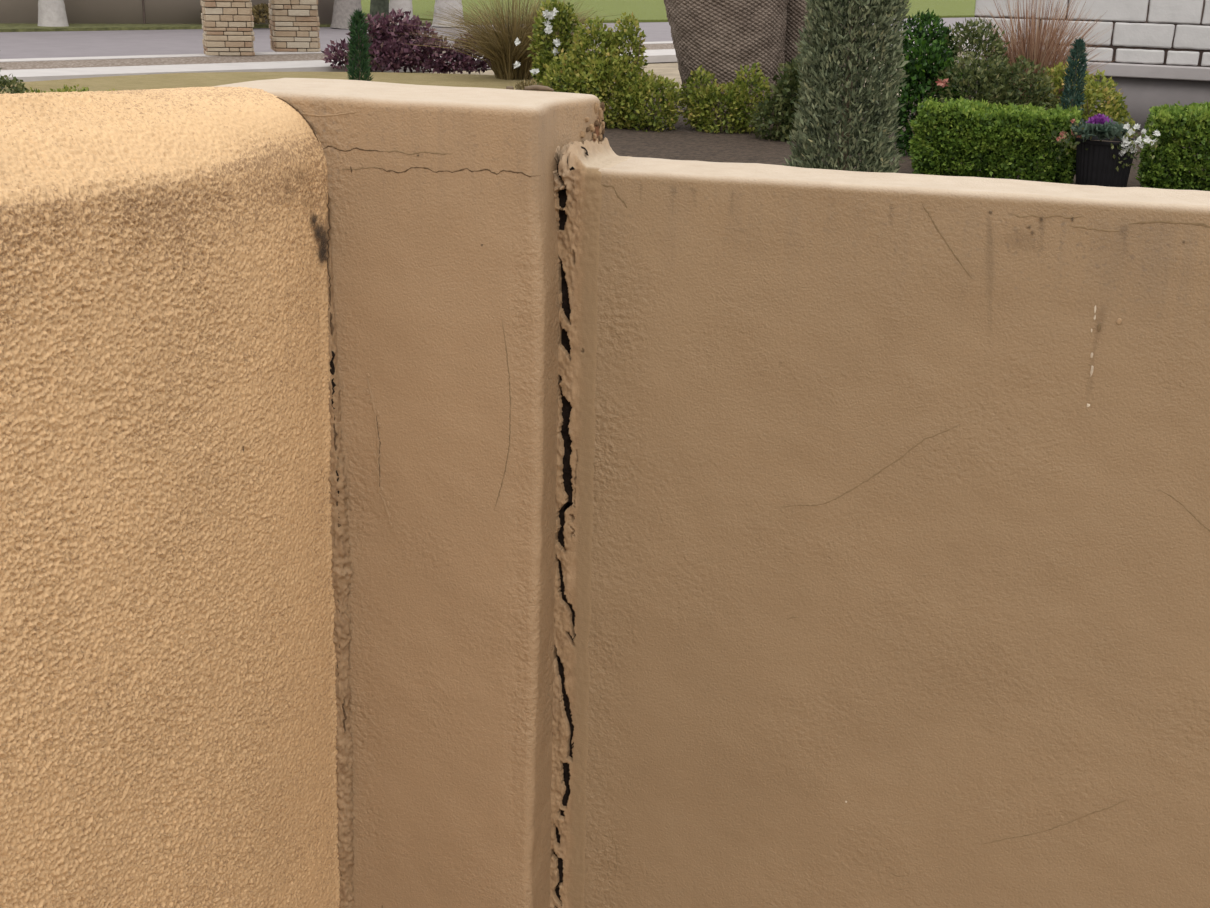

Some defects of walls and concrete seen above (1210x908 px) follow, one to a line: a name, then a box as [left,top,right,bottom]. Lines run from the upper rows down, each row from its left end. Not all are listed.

crack [276,97,589,527]
crack [337,600,347,731]
crack [553,261,576,902]